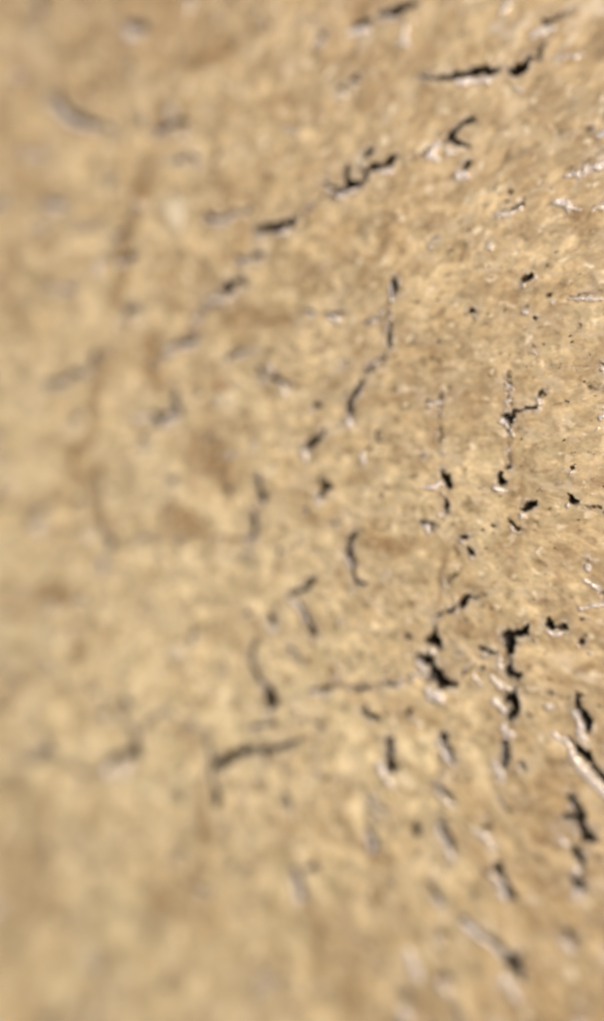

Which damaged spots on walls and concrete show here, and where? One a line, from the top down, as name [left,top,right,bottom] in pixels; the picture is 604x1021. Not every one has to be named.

crack [423,10,585,92]
crack [165,116,477,359]
crack [258,361,295,396]
crack [301,277,399,465]
crack [246,476,268,545]
crack [420,470,452,518]
crack [287,577,318,661]
crack [103,710,143,779]
crack [203,641,302,807]
crack [310,531,529,902]
crack [290,863,318,904]
crack [428,882,524,1005]